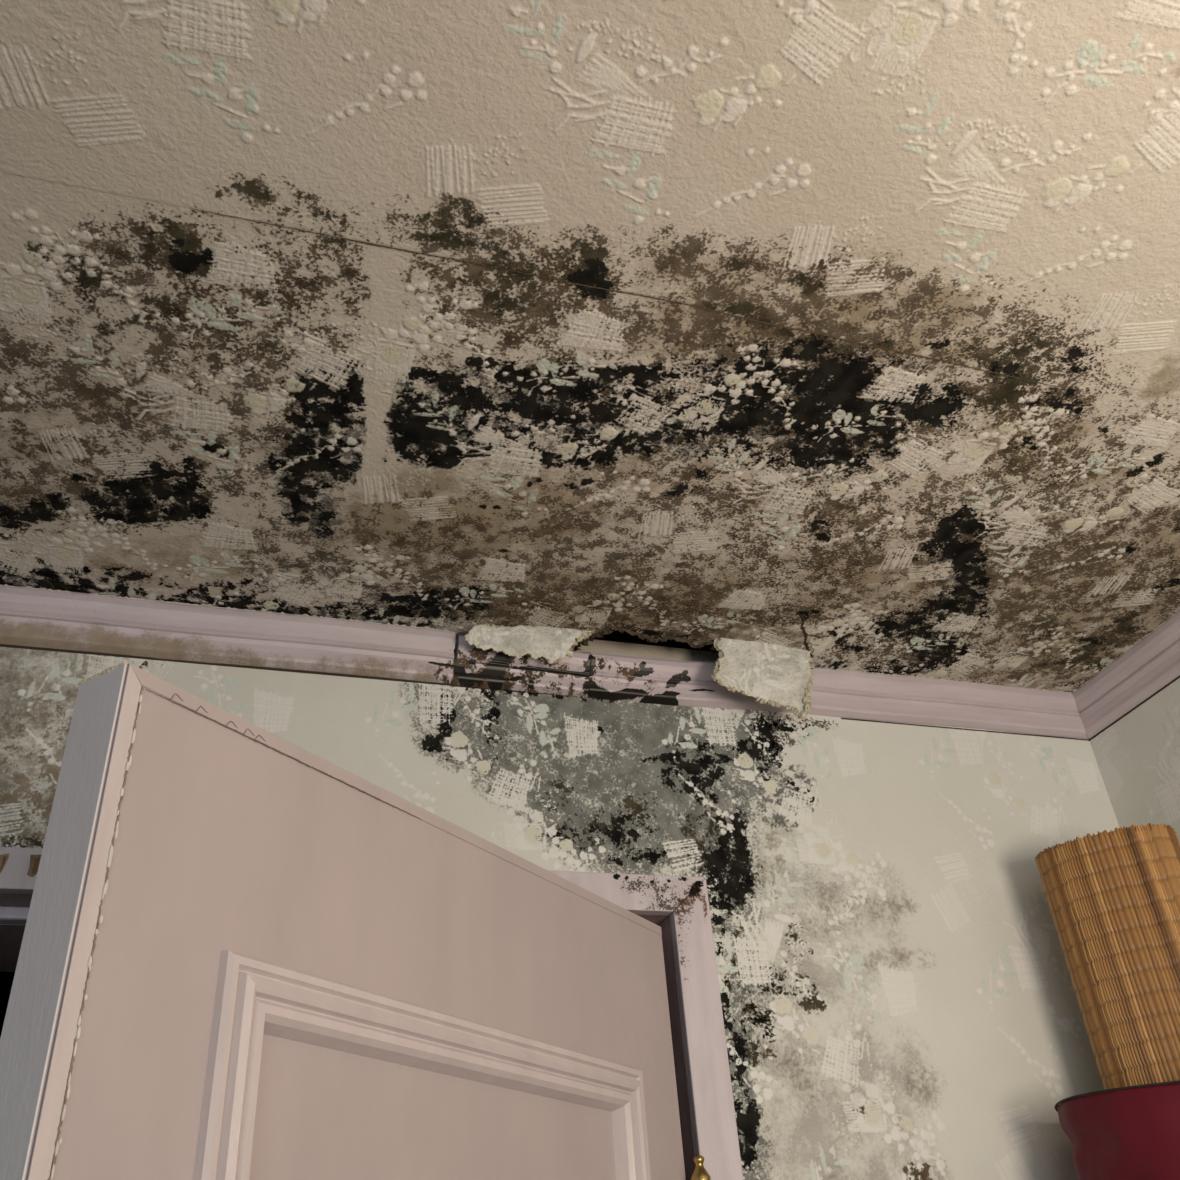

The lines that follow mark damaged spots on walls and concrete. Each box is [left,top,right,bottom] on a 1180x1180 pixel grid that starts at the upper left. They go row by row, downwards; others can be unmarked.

water stain [0,172,1180,692]
water stain [0,622,262,849]
peeling [760,658,815,719]
water stain [354,645,837,1180]
water stain [792,1033,933,1180]